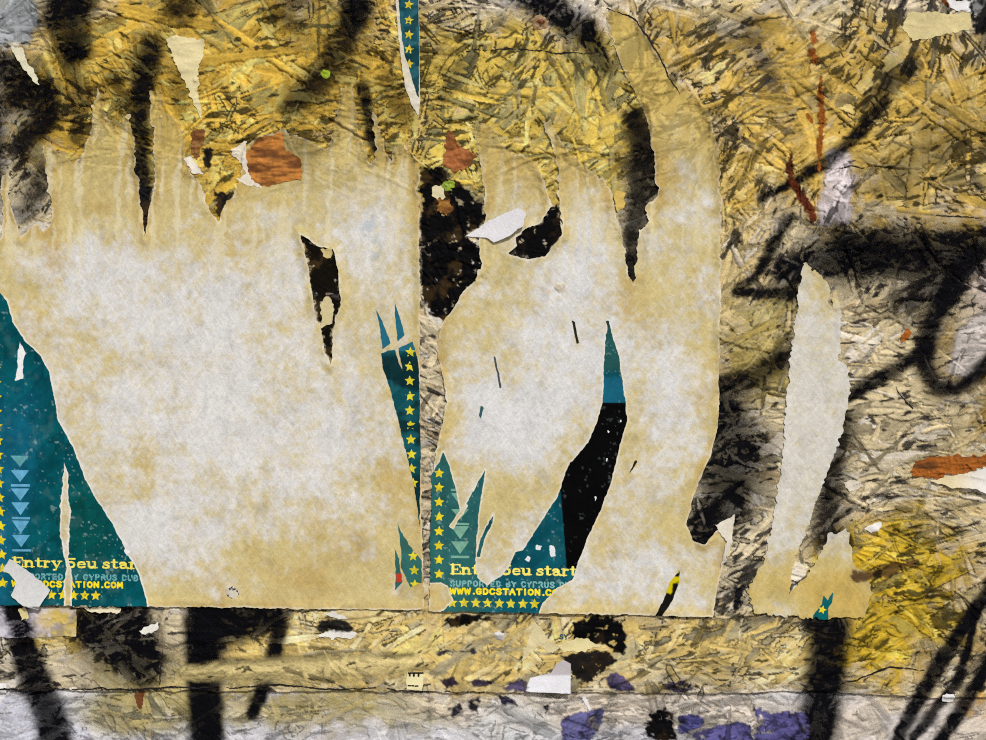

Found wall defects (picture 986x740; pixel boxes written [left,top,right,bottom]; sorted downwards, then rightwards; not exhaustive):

peeling [190,129,205,160]
peeling [246,132,303,187]
peeling [443,130,478,172]
peeling [437,197,453,216]